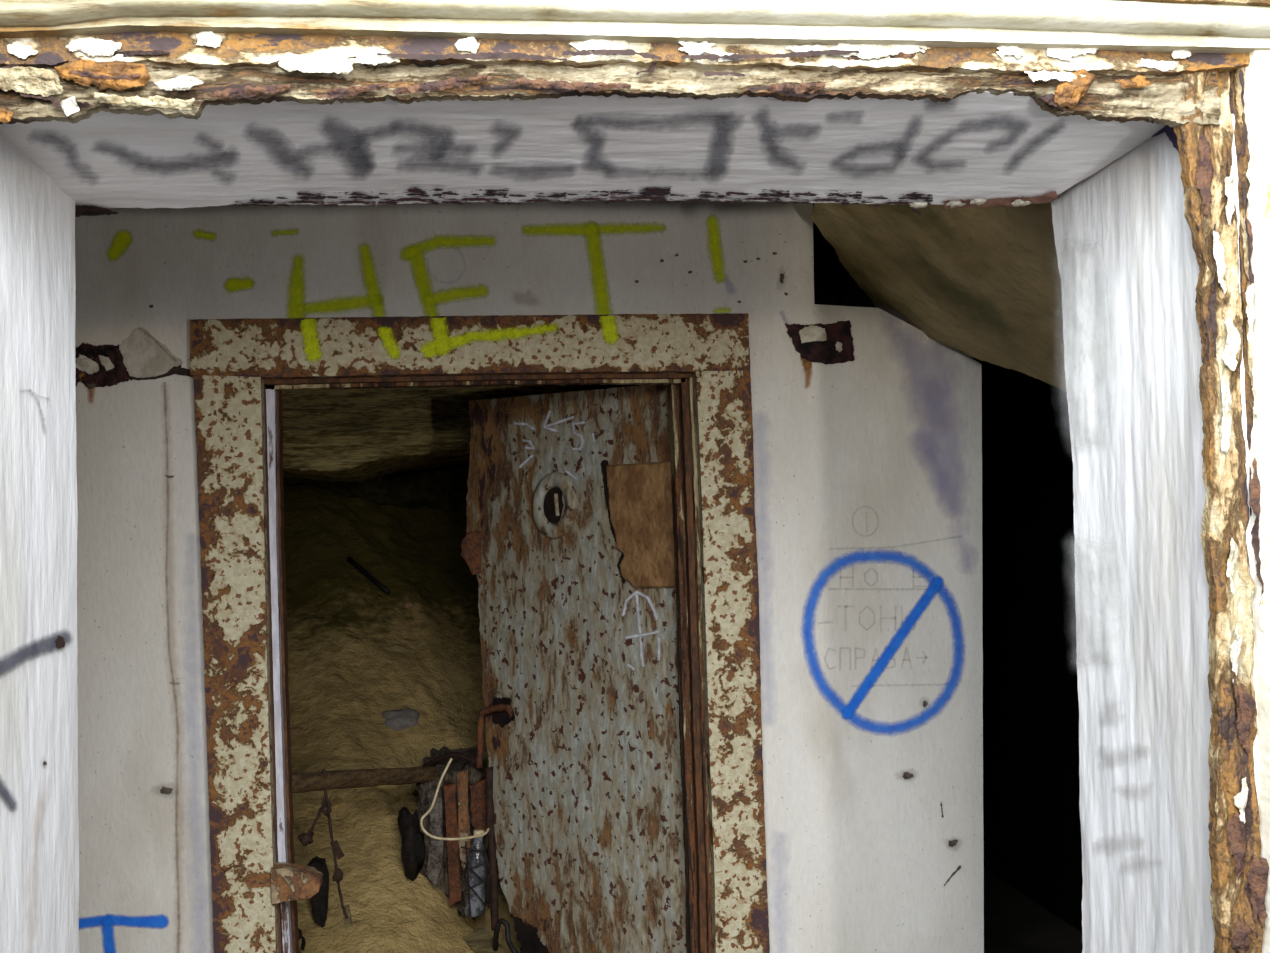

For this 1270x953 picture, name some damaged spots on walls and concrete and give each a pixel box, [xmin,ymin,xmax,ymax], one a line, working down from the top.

peeling [0,42,203,116]
peeling [65,37,170,57]
peeling [278,47,400,74]
peeling [786,43,930,59]
peeling [1136,50,1191,72]
corrosion [1196,133,1214,216]
peeling [1213,153,1257,293]
corrosion [1245,217,1253,255]
peeling [1221,284,1260,453]
corrosion [1249,458,1261,515]
corrosion [1234,677,1256,754]
corrosion [1227,813,1269,953]